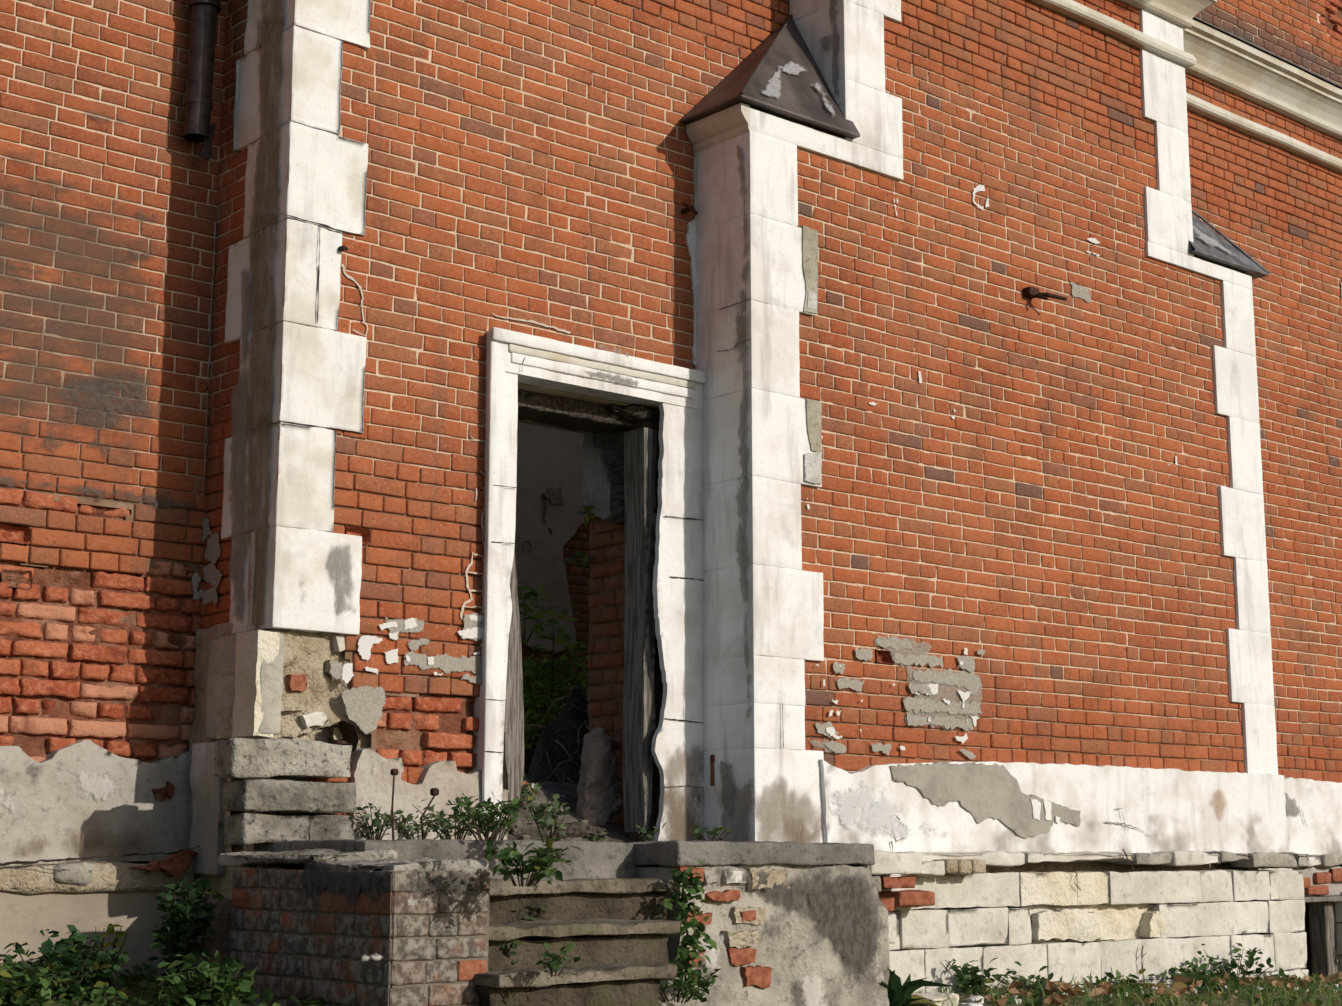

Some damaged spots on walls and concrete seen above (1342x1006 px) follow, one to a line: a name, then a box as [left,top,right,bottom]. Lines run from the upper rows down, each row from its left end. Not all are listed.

leakage [735,146,751,719]
leakage [328,545,352,614]
hole [875,648,893,664]
spalling [215,614,509,840]
peeling [826,700,847,739]
peeling [915,684,979,744]
spalling [152,781,175,801]
leakage [720,762,733,816]
peeling [889,745,1081,839]
spalling [227,845,243,853]
spalling [675,866,790,988]